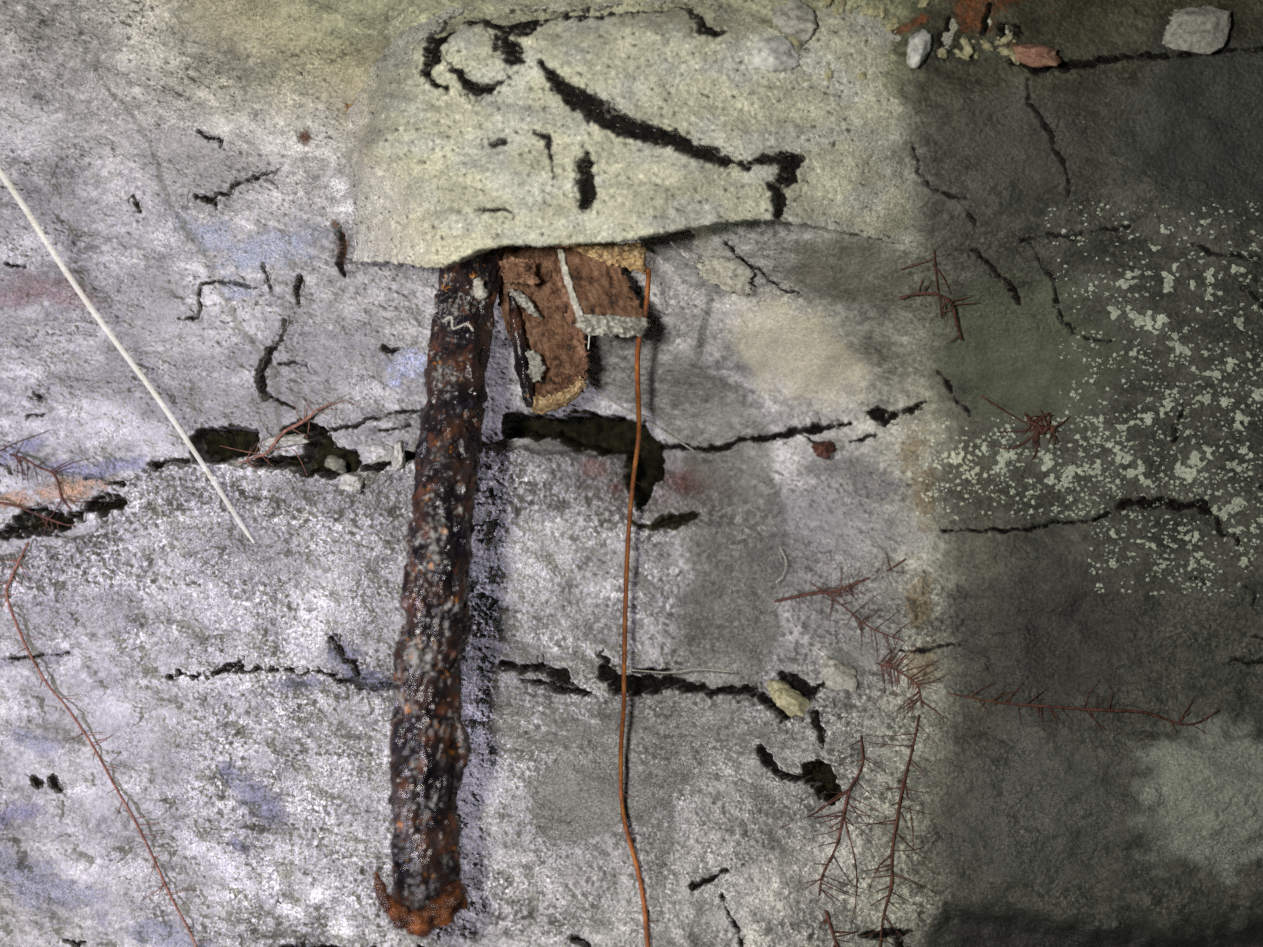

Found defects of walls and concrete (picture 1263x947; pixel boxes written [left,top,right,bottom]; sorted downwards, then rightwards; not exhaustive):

crack [417,0,809,219]
crack [911,47,1263,344]
rust [498,256,541,287]
crack [26,390,45,420]
crack [327,408,423,432]
crack [660,371,971,455]
crack [0,458,190,539]
crack [942,489,1240,547]
rust [417,733,435,809]
rust [453,716,472,790]
crack [498,647,827,783]
rust [374,871,396,912]